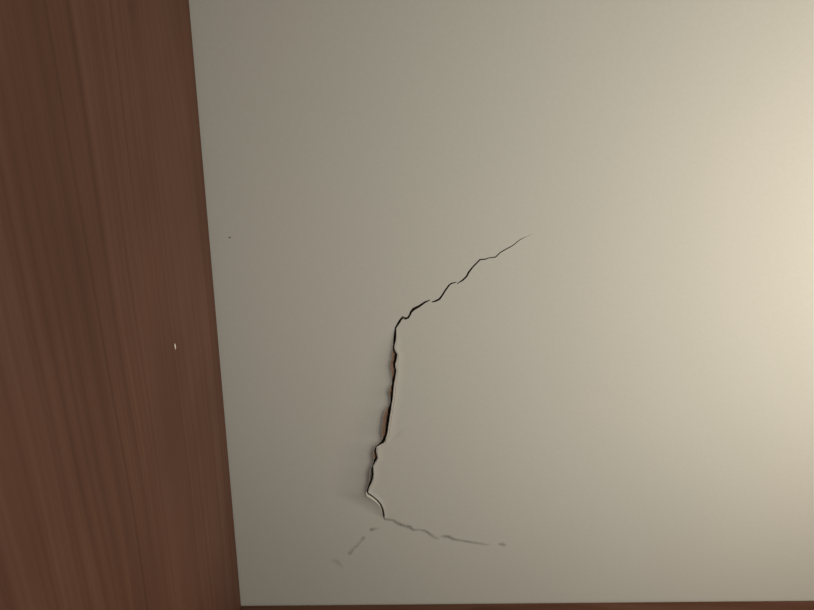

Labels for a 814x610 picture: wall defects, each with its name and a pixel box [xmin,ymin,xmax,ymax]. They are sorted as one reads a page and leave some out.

crack [326,236,527,518]